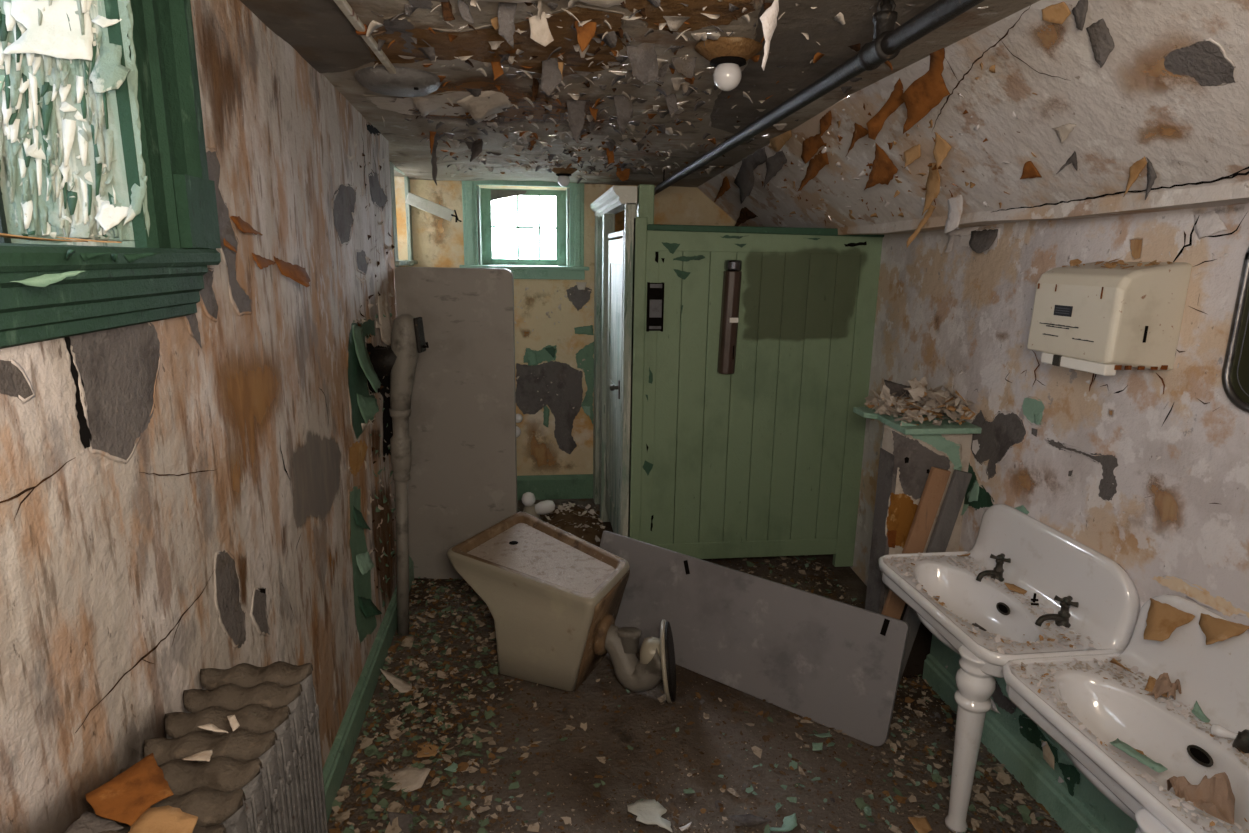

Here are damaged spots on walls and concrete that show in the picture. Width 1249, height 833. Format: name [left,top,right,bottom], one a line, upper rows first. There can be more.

peeling [0,0,160,293]
spalling [363,0,1000,255]
crack [993,167,1249,314]
flaking render [0,358,36,404]
crack [0,457,76,520]
flaking render [64,322,161,464]
crack [141,468,217,476]
peeling [293,142,396,643]
flaking render [514,282,594,454]
flaking render [890,396,1119,502]
crack [75,569,215,733]
peeling [1144,576,1249,645]